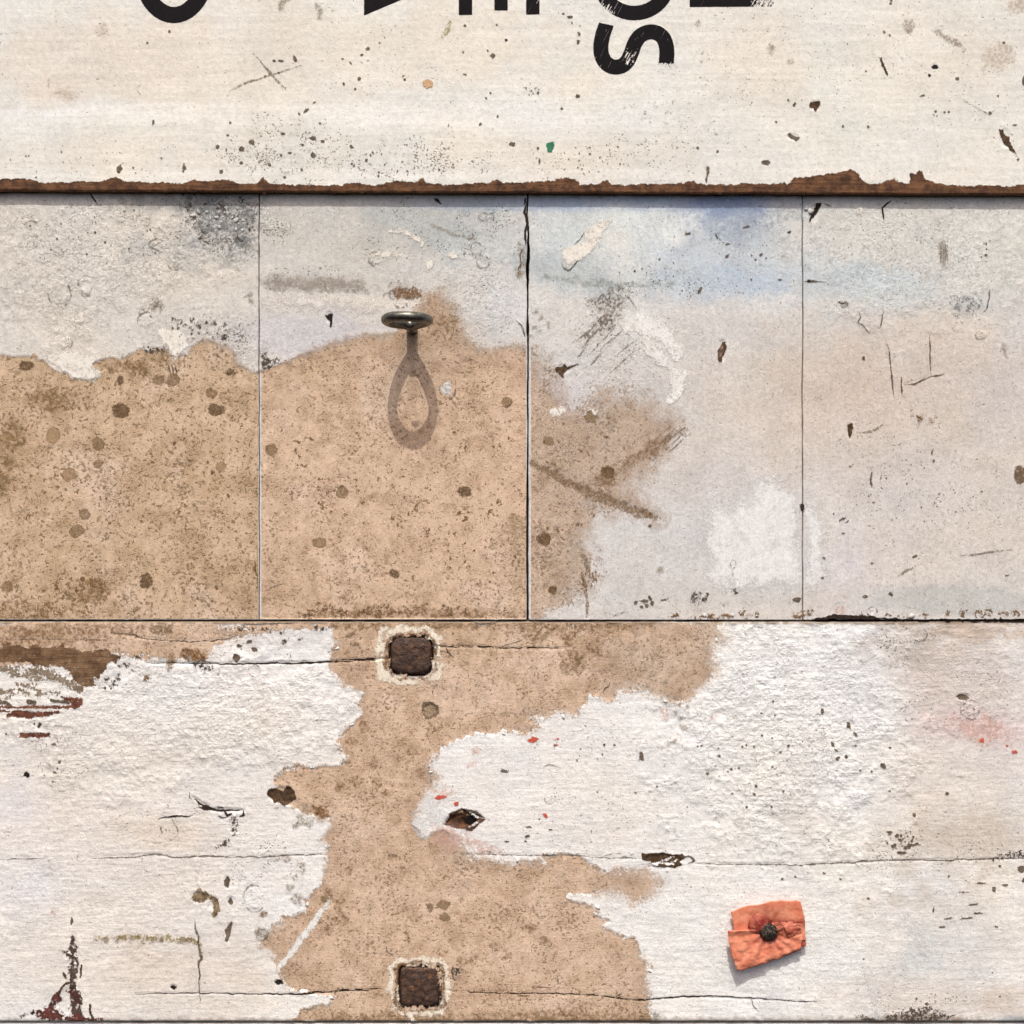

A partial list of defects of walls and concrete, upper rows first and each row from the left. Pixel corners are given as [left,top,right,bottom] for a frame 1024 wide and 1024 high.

peeling [0,291,760,1022]
rust [384,632,438,681]
crack [471,851,632,859]
crack [699,858,1024,866]
rust [393,960,447,1012]
crack [450,978,817,1009]